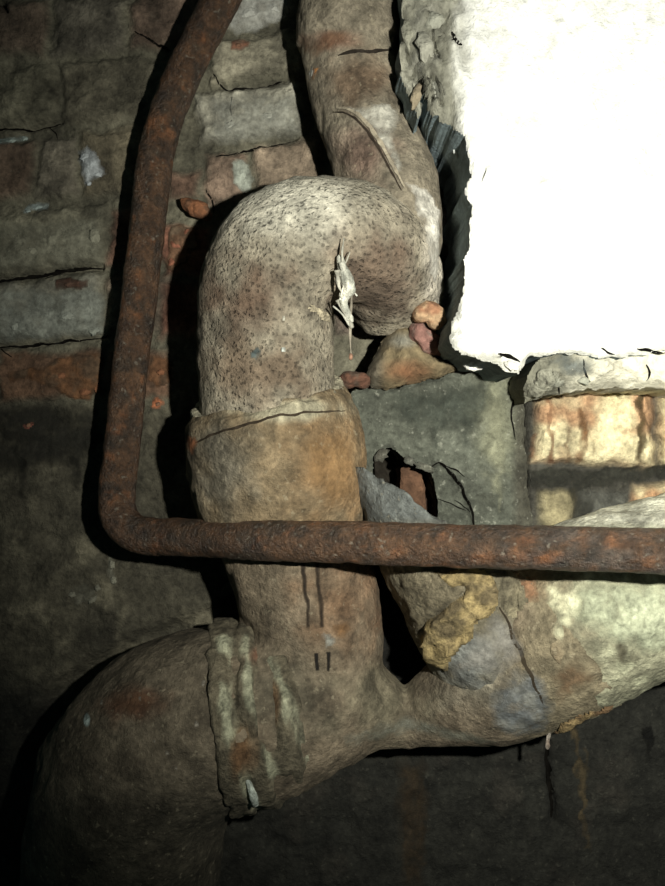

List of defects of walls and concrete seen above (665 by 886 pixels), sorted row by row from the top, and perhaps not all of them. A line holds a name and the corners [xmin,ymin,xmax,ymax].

peeling [374,448,390,463]
peeling [404,457,435,473]
crack [432,462,475,525]